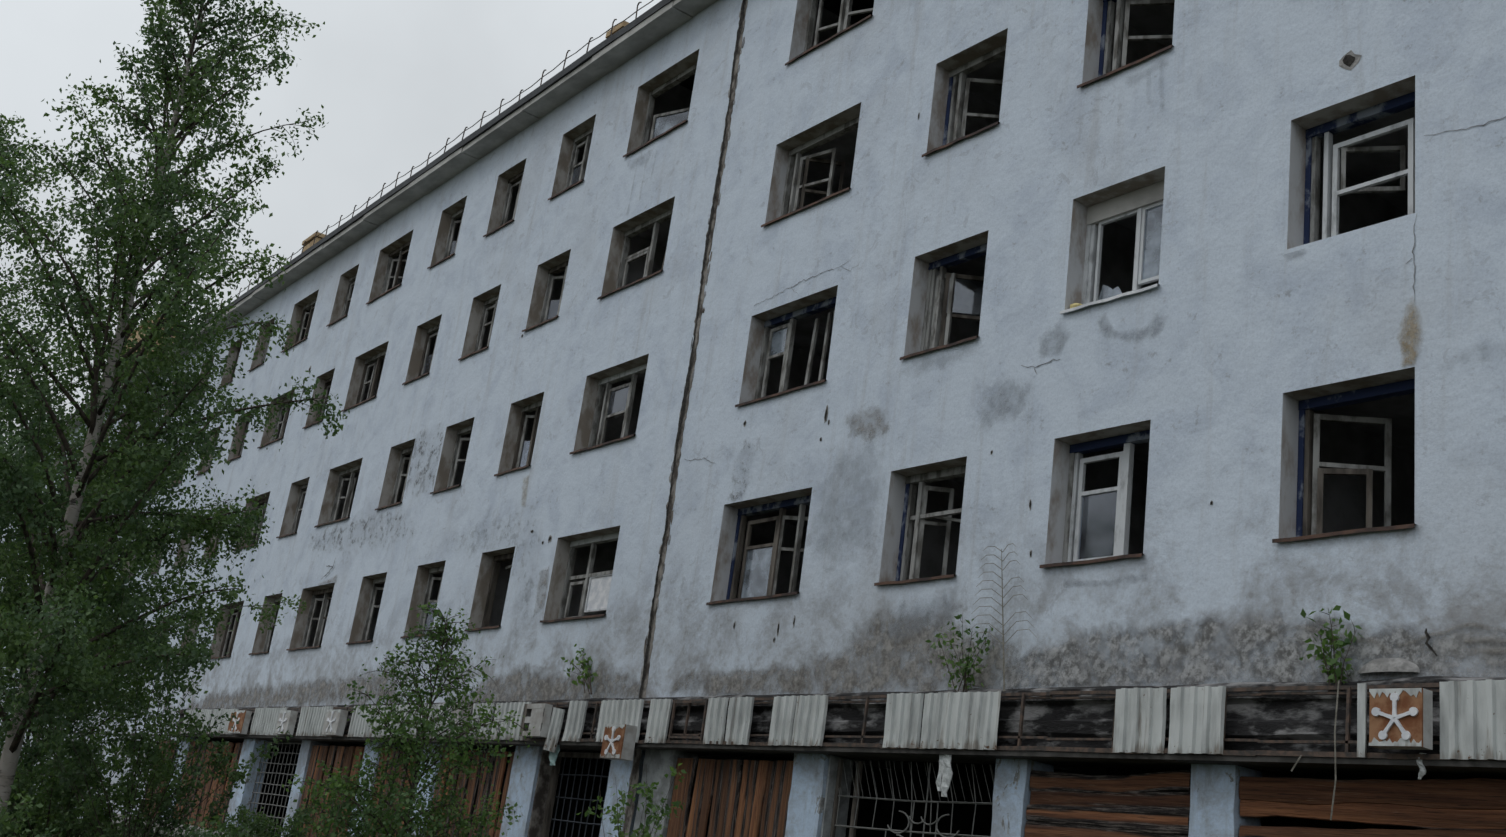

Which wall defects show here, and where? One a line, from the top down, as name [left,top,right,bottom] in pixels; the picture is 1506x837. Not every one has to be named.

crack [1424,116,1506,136]
crack [754,256,858,306]
water stain [1420,632,1506,677]
water stain [188,669,397,709]
water stain [461,664,640,702]